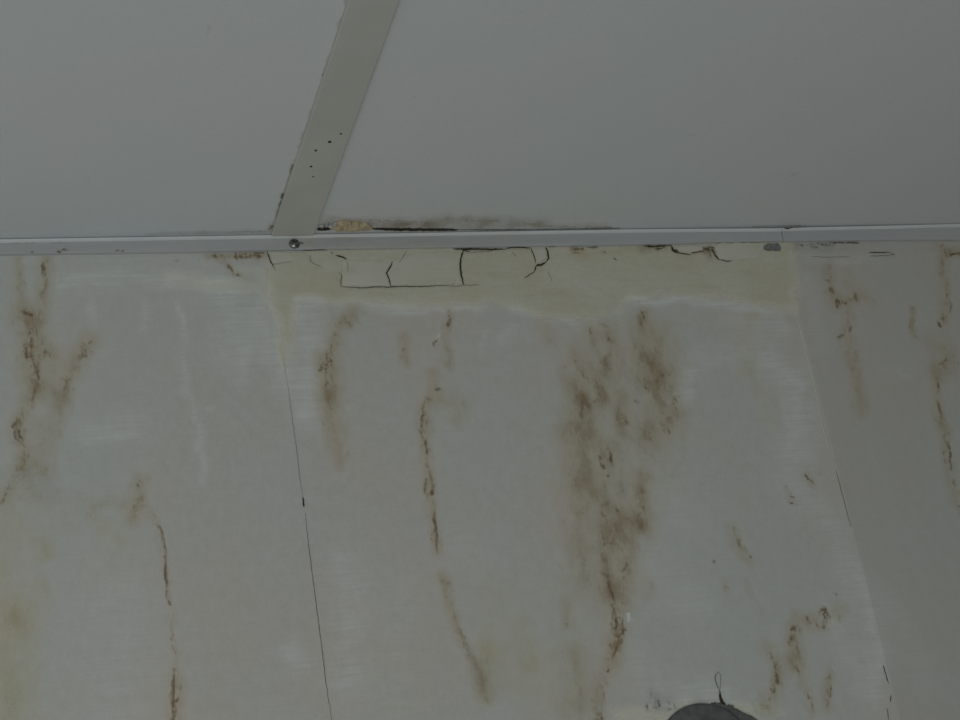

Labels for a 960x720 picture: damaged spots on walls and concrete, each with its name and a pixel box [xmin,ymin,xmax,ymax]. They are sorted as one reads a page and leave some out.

crack [267,226,559,288]
crack [645,245,729,262]
corrosion [575,375,647,659]